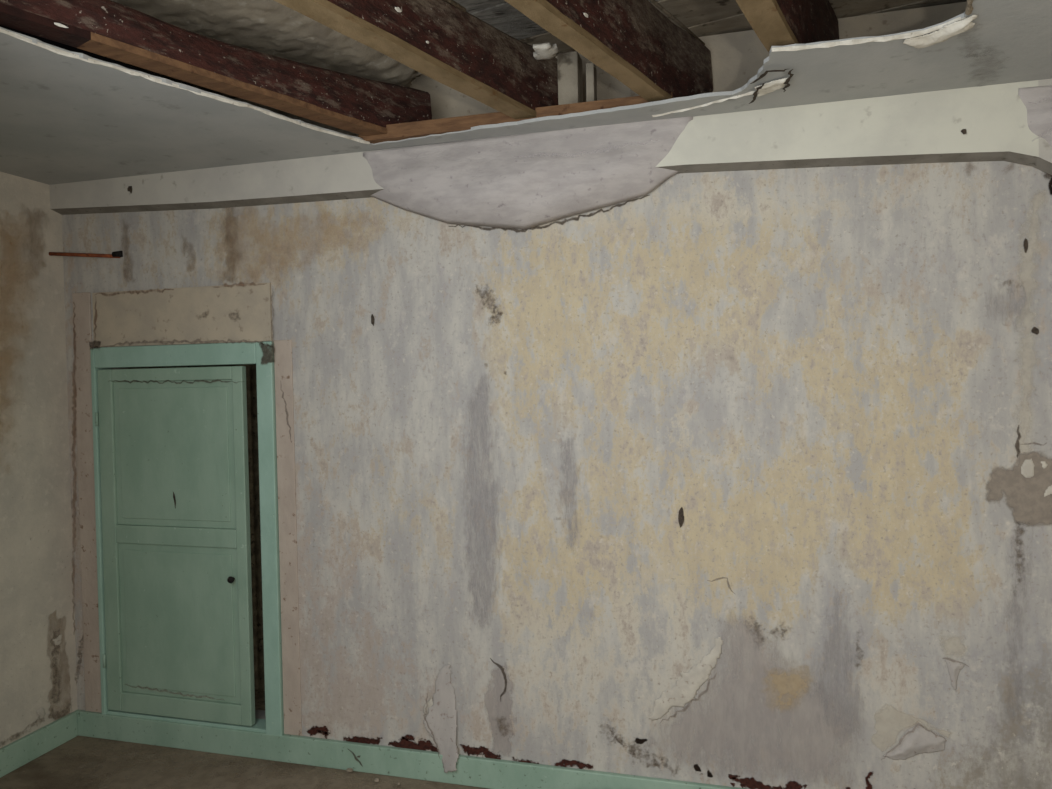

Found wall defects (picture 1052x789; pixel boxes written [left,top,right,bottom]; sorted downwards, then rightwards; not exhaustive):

spalling [111,0,423,87]
spalling [533,42,560,60]
spalling [771,0,977,52]
spalling [0,28,370,144]
spalling [652,69,794,117]
spalling [986,425,1052,566]
spalling [460,744,539,764]